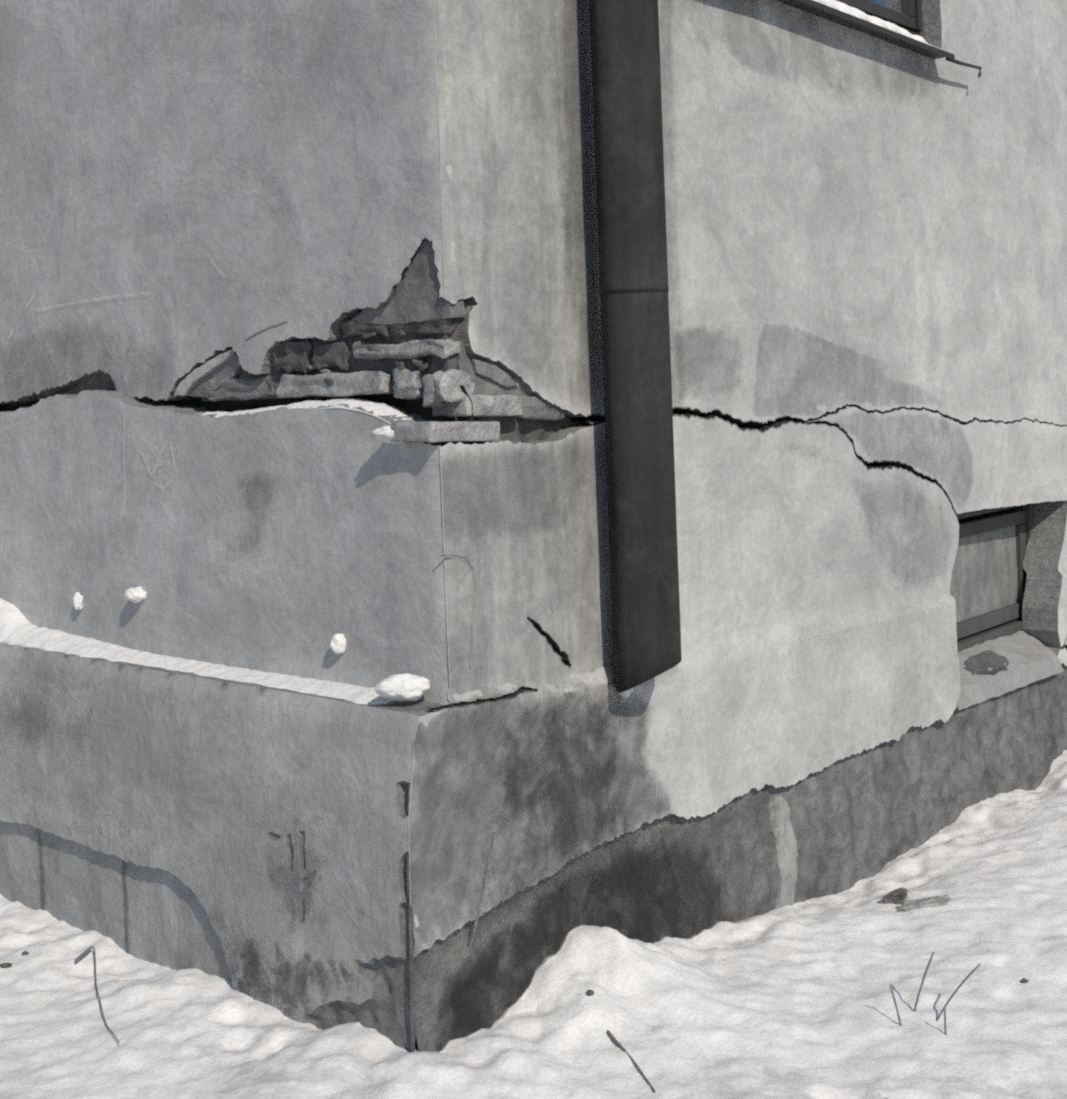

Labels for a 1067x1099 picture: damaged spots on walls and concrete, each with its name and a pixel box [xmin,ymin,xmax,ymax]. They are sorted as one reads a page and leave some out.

flaking render [174,237,583,443]
crack [0,372,116,411]
crack [160,385,473,444]
crack [572,413,605,425]
crack [672,404,1067,515]
crack [439,555,476,669]
crack [527,616,572,669]
crack [428,686,538,711]
water stain [410,695,721,1052]